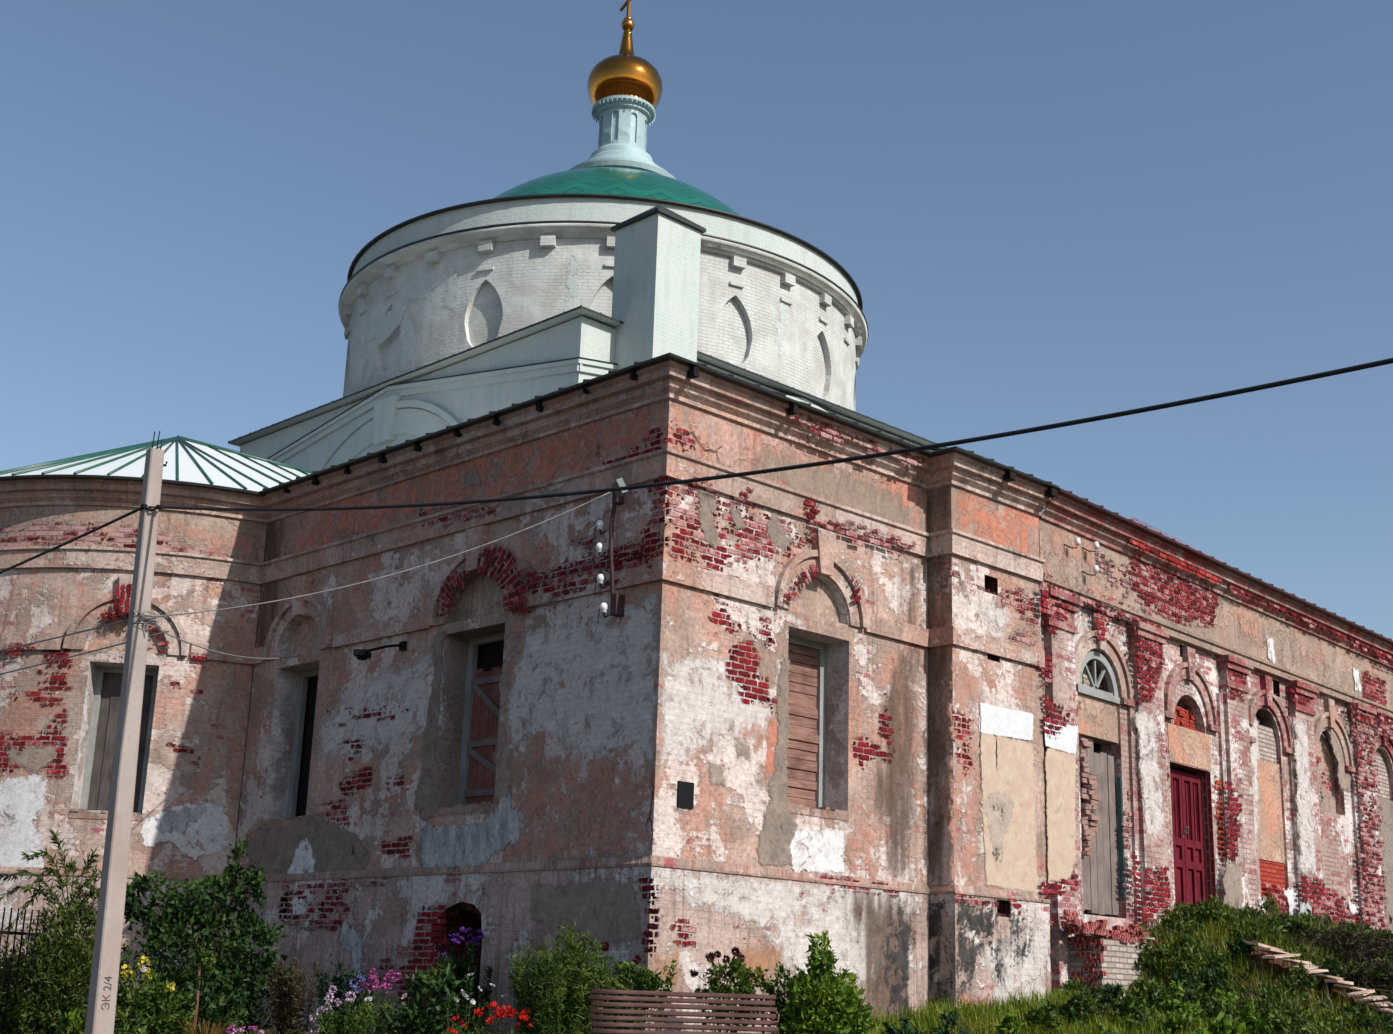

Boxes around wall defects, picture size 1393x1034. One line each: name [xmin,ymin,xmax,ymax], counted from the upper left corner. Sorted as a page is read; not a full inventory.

flaking render [96,584,132,623]
flaking render [149,621,171,658]
peeling [436,467,916,770]
peeling [0,632,74,868]
peeling [140,802,233,860]
flaking render [276,838,448,1009]
peeling [709,763,726,786]
peeling [638,827,899,986]
water stain [854,895,1033,1016]
peeling [950,518,1393,1007]